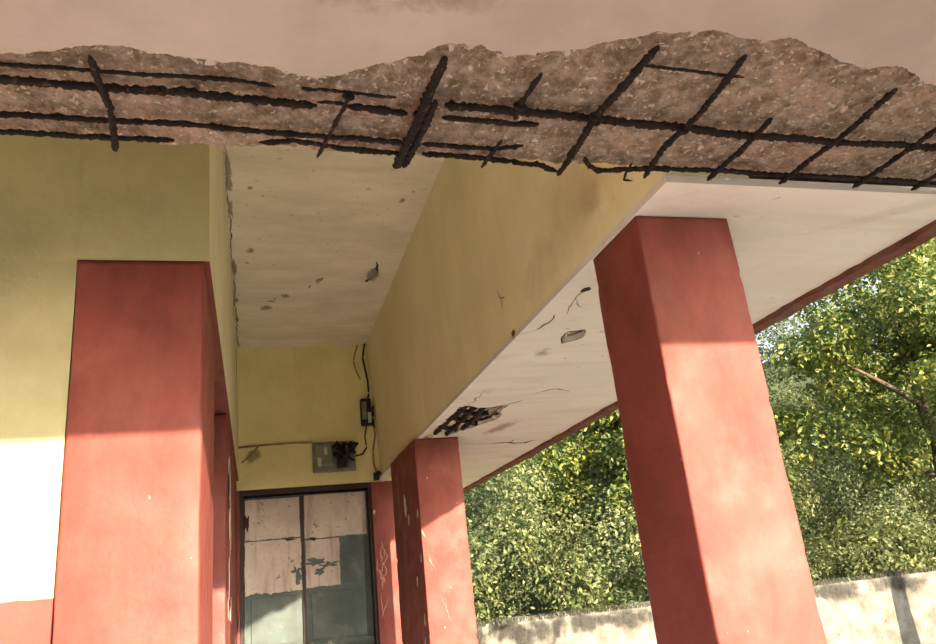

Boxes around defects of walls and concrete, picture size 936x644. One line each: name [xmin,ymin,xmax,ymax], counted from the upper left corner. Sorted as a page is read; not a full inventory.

spalling [0,30,936,191]
crack [523,287,591,334]
spalling [426,390,522,438]